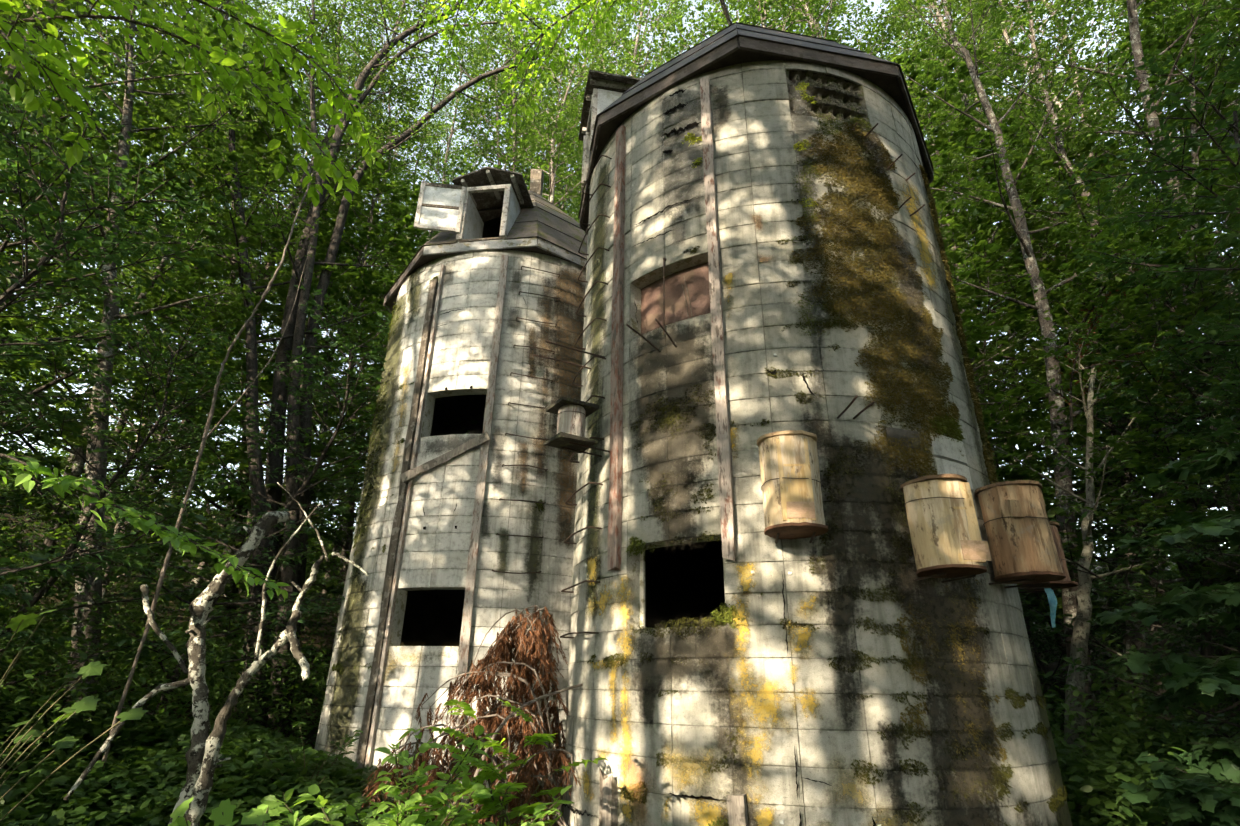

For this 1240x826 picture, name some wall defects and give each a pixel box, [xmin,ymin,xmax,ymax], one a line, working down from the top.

water stain [658,85,731,244]
water stain [789,84,819,255]
water stain [425,164,610,616]
water stain [629,321,738,544]
water stain [801,275,1072,826]
water stain [577,770,594,800]
water stain [590,598,823,826]